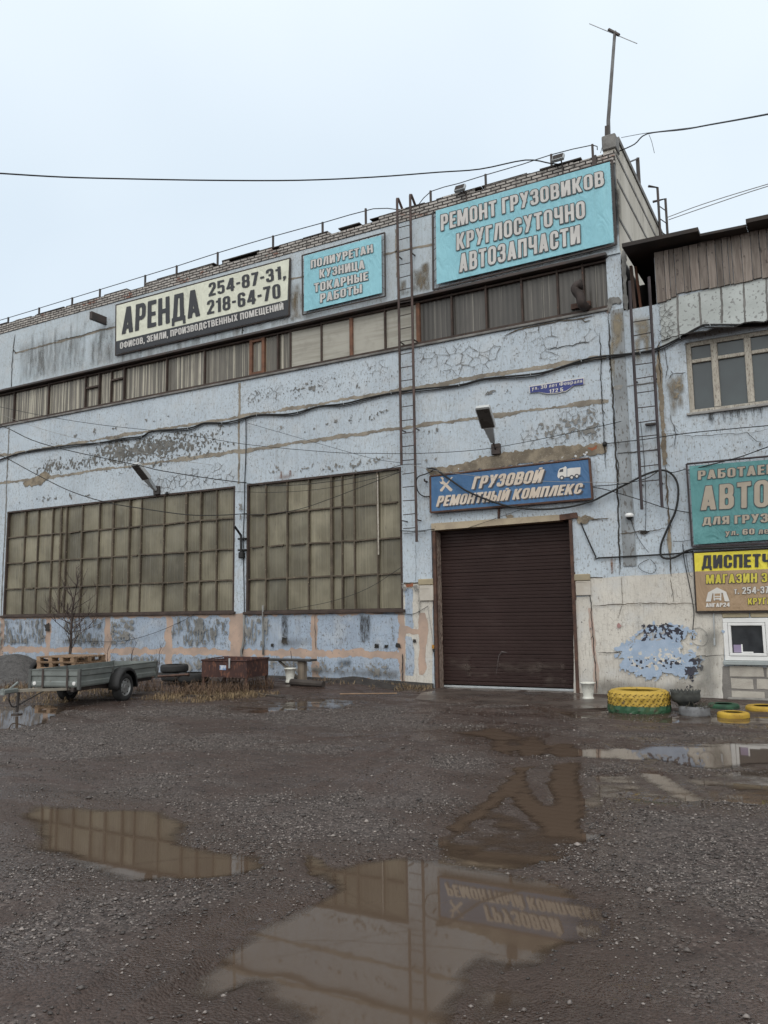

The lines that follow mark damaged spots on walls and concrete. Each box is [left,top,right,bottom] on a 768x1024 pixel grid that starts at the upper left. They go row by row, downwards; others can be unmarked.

peeling [23,415,235,502]
crack [420,304,766,693]
peeling [0,618,44,660]
peeling [63,615,227,671]
peeling [614,621,705,689]